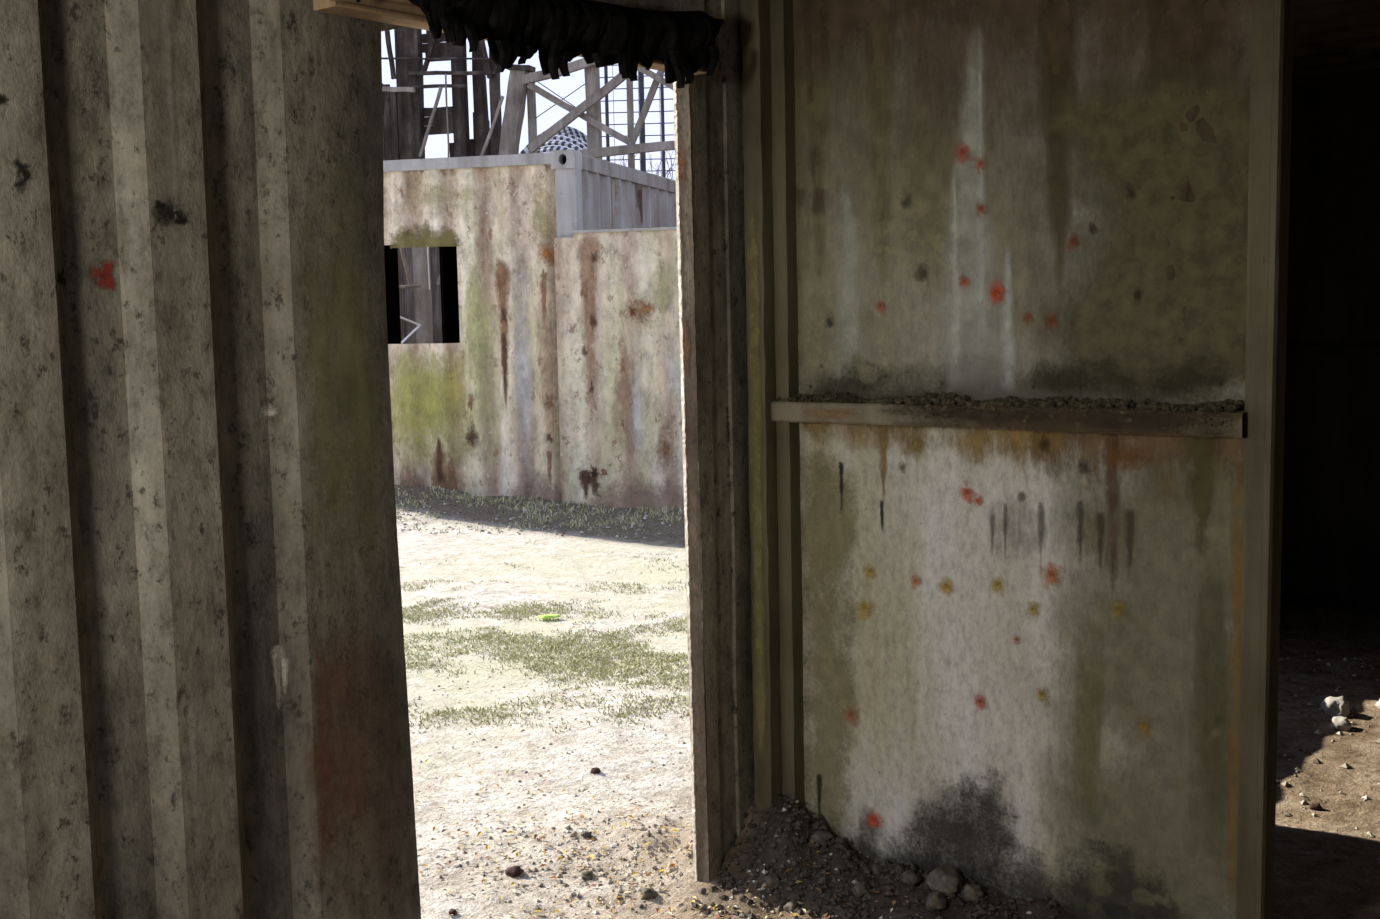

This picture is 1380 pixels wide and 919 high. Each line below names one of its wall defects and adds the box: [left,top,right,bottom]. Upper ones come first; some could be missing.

water stain [793,0,1251,384]
corrosion [495,262,509,400]
corrosion [578,239,599,392]
water stain [855,773,1178,919]